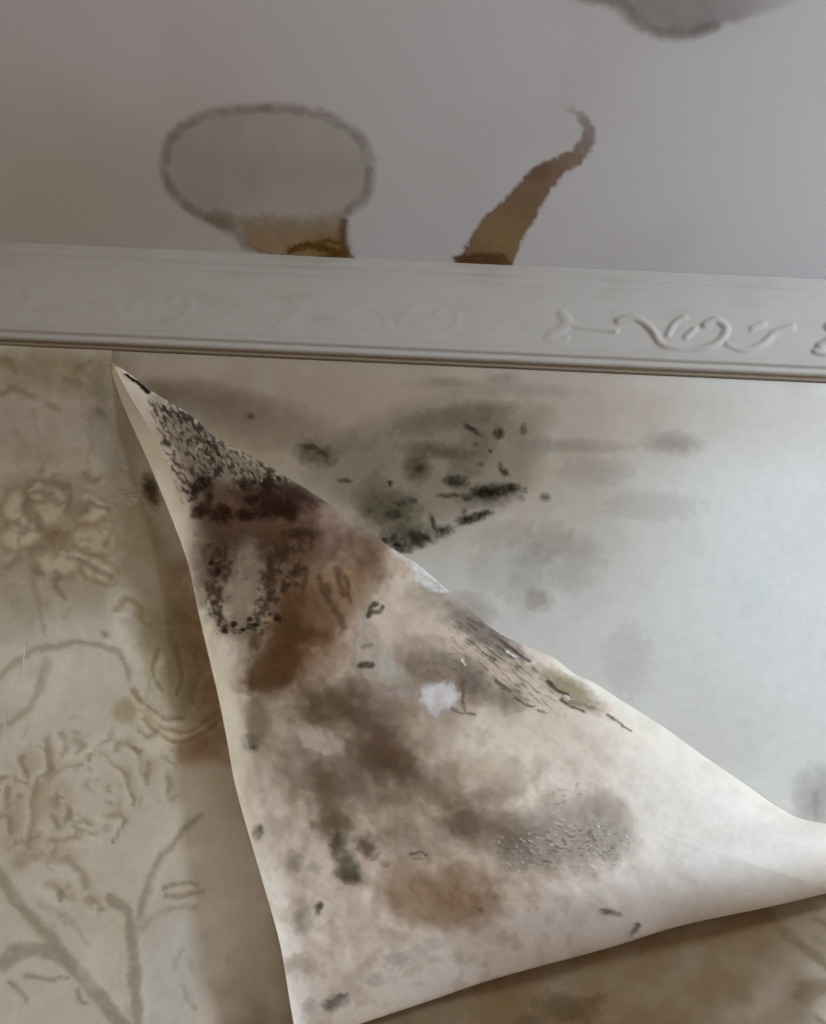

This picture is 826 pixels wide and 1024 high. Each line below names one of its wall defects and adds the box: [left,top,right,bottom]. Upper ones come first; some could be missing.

leakage [246,220,353,258]
leakage [124,374,291,502]
leakage [441,470,516,501]
leakage [373,481,449,553]
leakage [459,510,489,524]
leakage [128,478,195,698]
leakage [201,524,313,633]
peeling [356,609,459,717]
peeling [298,727,342,755]
peeling [350,814,377,837]
leakage [336,838,374,881]
leakage [388,876,481,923]